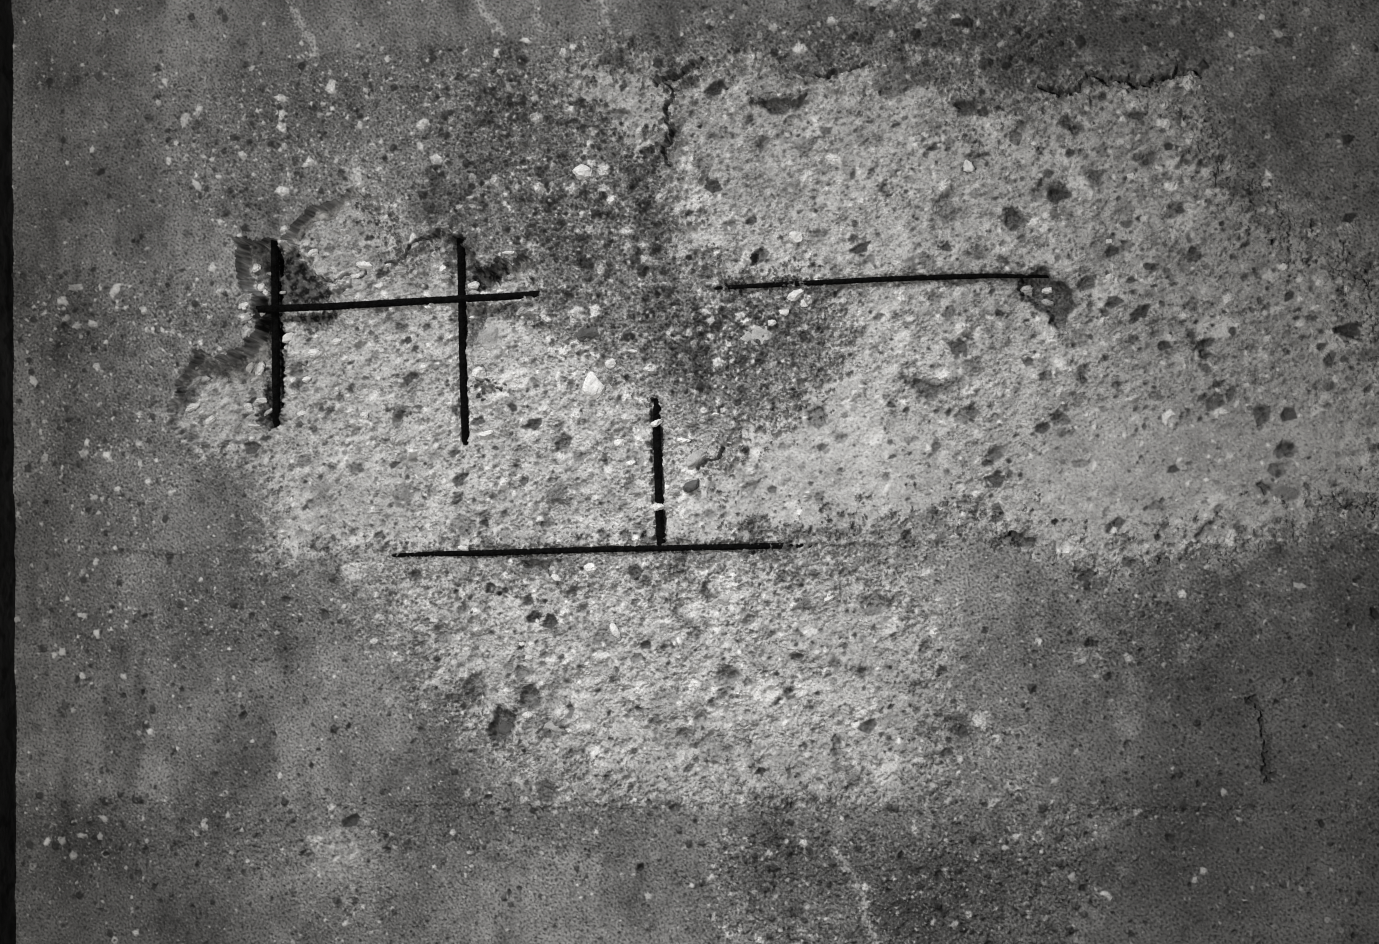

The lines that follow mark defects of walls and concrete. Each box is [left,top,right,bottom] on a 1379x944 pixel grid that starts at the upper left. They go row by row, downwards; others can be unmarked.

crack [654,58,705,168]
crack [819,62,868,80]
crack [1038,67,1203,98]
crack [393,230,441,267]
spalling [141,0,1379,819]
spalling [290,793,411,913]